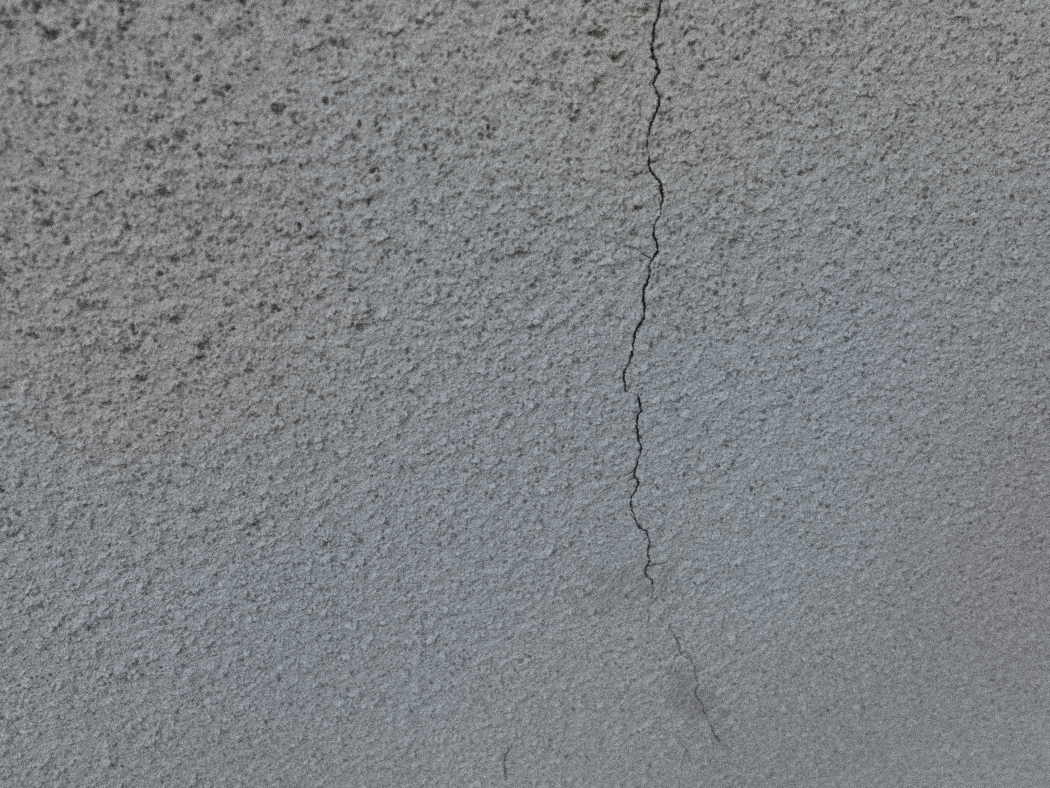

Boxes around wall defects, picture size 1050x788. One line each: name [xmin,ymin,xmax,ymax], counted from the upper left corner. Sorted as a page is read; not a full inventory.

crack [623,0,724,746]